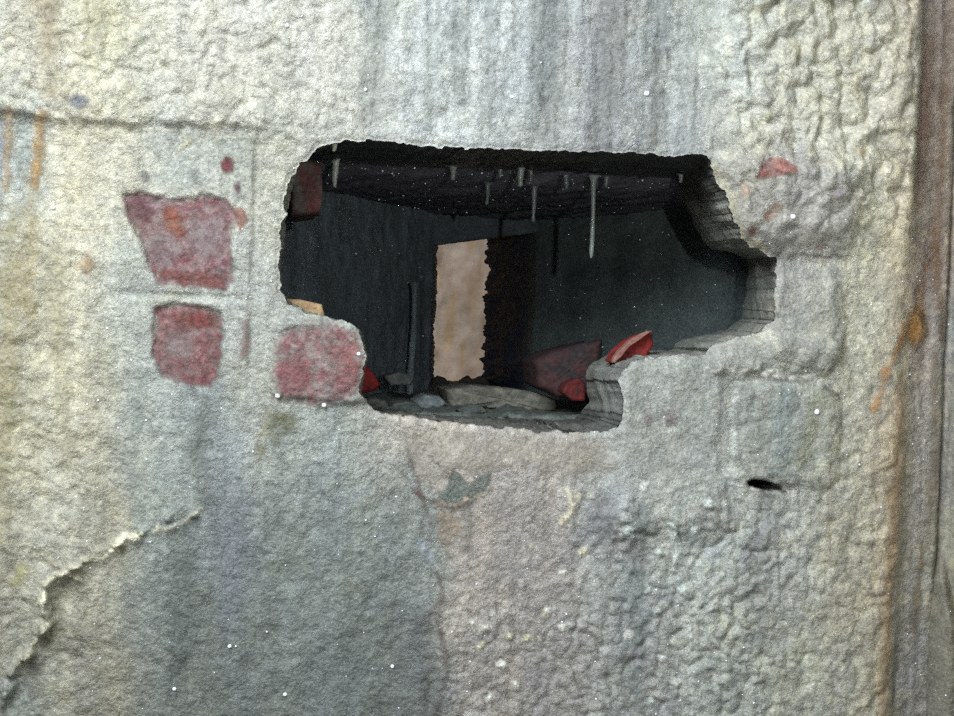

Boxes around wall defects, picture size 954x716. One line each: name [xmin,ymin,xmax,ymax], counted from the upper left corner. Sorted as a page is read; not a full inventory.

peeling [125,128,253,289]
spalling [285,160,323,222]
spalling [758,158,797,178]
peeling [153,304,222,386]
spalling [272,324,361,404]
spalling [433,375,490,385]
spalling [521,339,602,402]
corrosion [872,290,927,410]